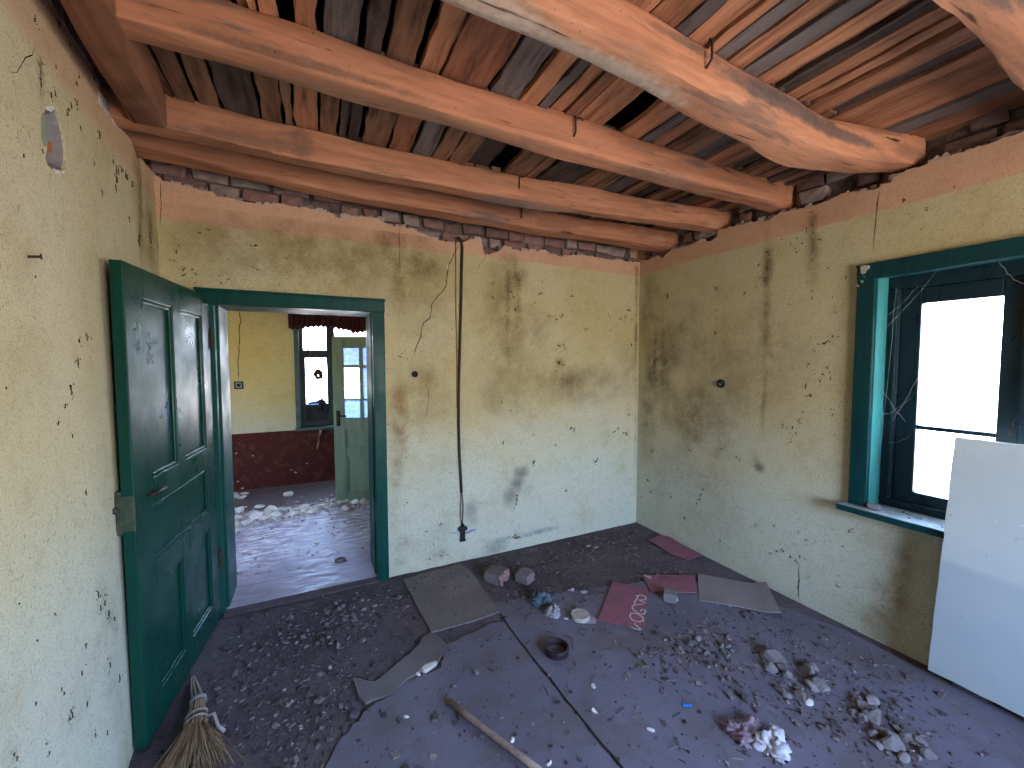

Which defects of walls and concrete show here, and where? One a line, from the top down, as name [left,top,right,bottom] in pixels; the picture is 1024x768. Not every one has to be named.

flaking render [40,0,120,174]
flaking render [150,160,718,262]
flaking render [731,107,1024,298]
crack [414,246,459,354]